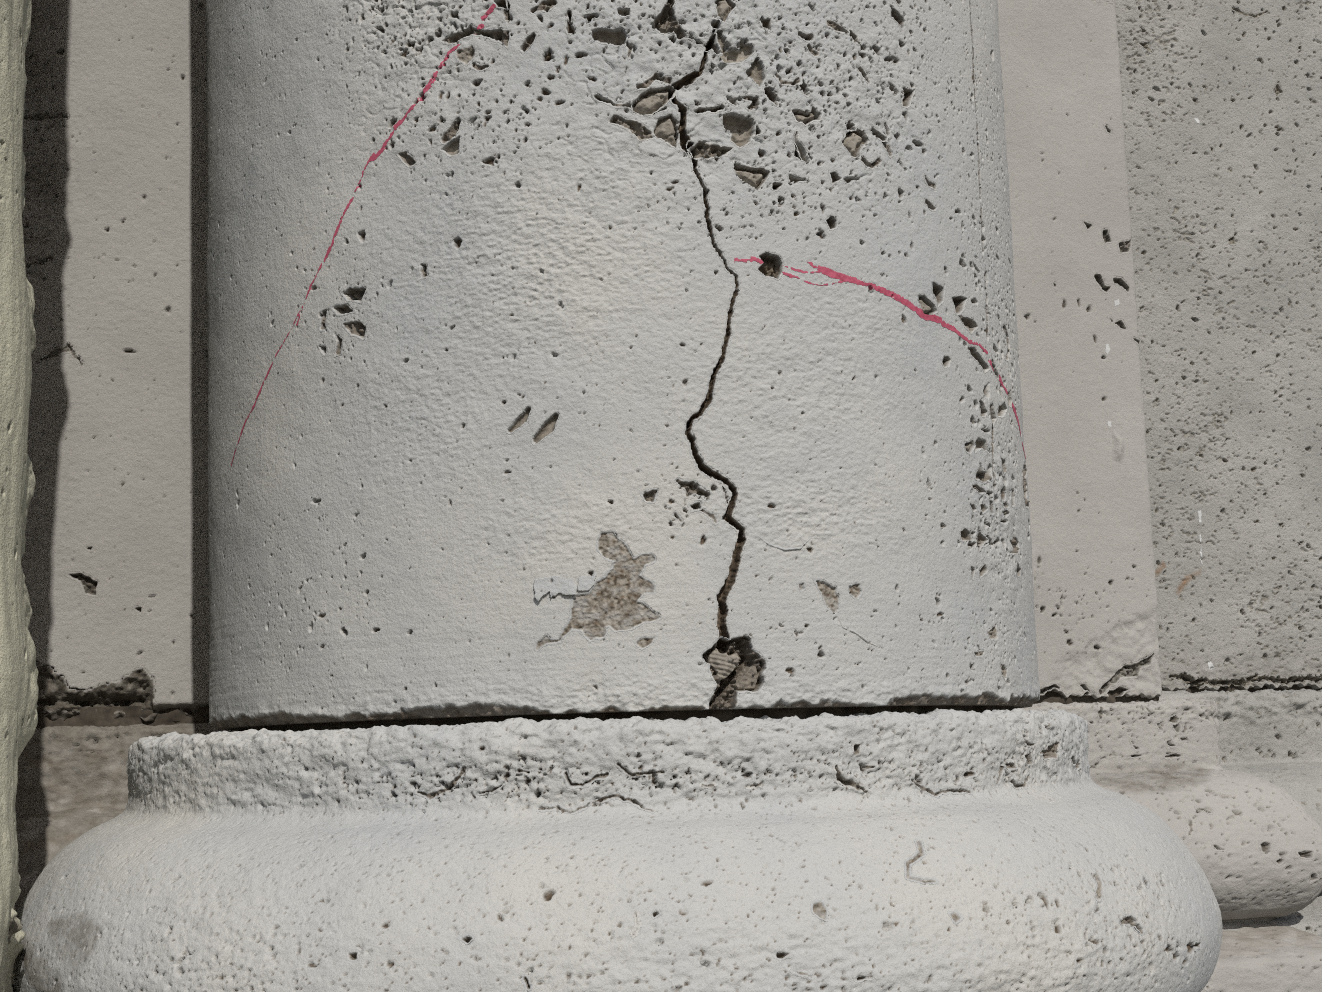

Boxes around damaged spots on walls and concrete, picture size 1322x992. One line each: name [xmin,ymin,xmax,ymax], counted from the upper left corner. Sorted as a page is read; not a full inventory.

spalling [439,0,538,71]
spalling [528,0,576,35]
spalling [439,118,462,158]
spalling [317,285,368,358]
crack [669,0,749,640]
spalling [505,405,560,445]
spalling [640,488,659,504]
spalling [672,478,719,525]
peeling [533,529,662,652]
peeling [796,577,882,649]
spalling [36,662,157,716]
spalling [701,634,770,709]